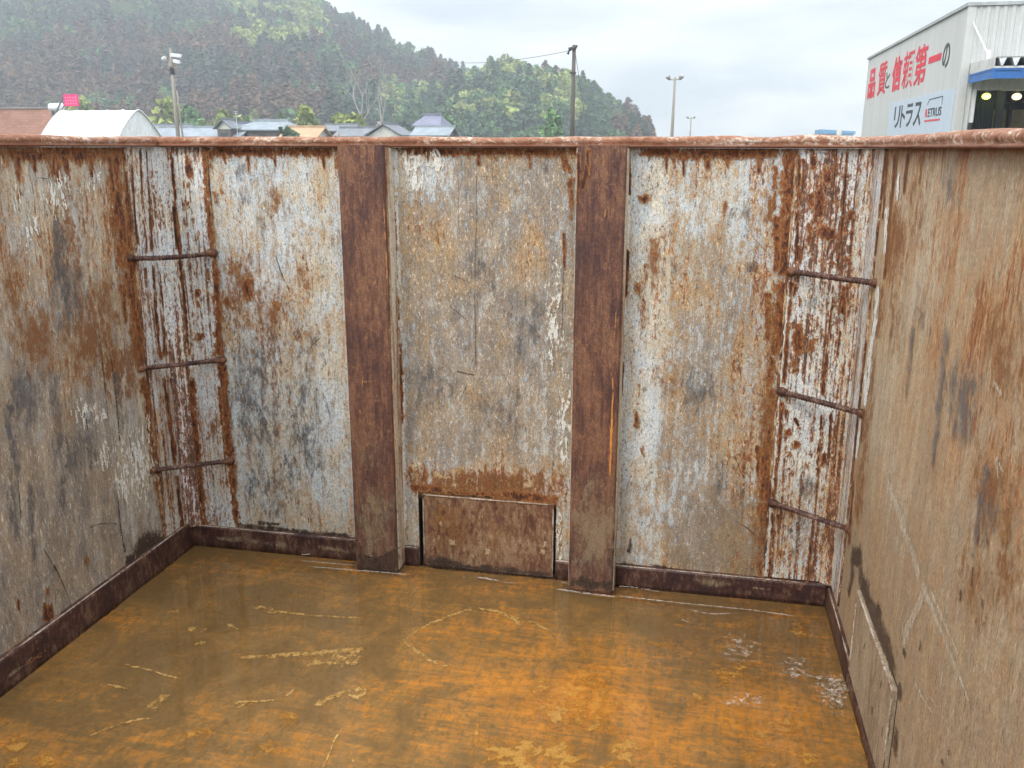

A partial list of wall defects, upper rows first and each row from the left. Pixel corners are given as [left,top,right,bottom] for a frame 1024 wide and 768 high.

rust [832,148,869,269]
rust [43,586,54,623]
rust [1,147,169,464]
rust [162,376,184,527]
rust [170,133,353,537]
rust [383,209,566,506]
rust [625,148,835,579]
rust [806,519,826,596]
rust [848,151,931,545]
rust [952,443,1022,632]
rust [979,302,1024,400]
rust [485,638,649,768]